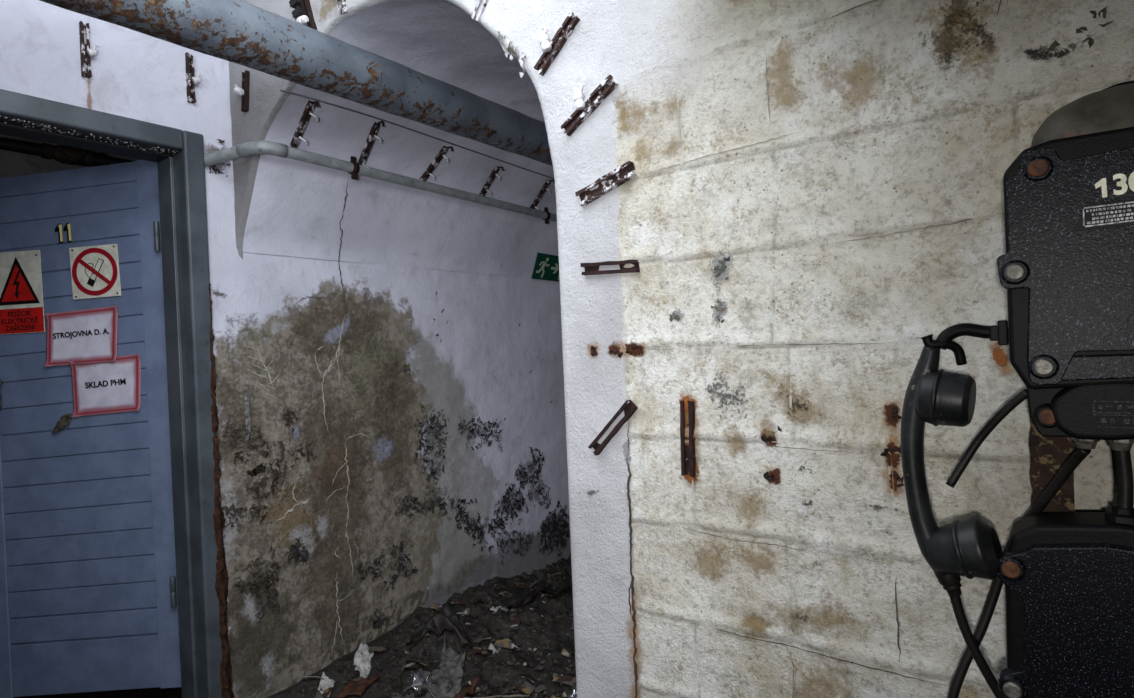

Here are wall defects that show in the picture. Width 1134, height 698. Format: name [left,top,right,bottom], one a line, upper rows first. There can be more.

leakage [921,0,1000,70]
crack [338,177,349,316]
rust [588,341,645,358]
rust [209,284,235,698]
leakage [214,277,442,698]